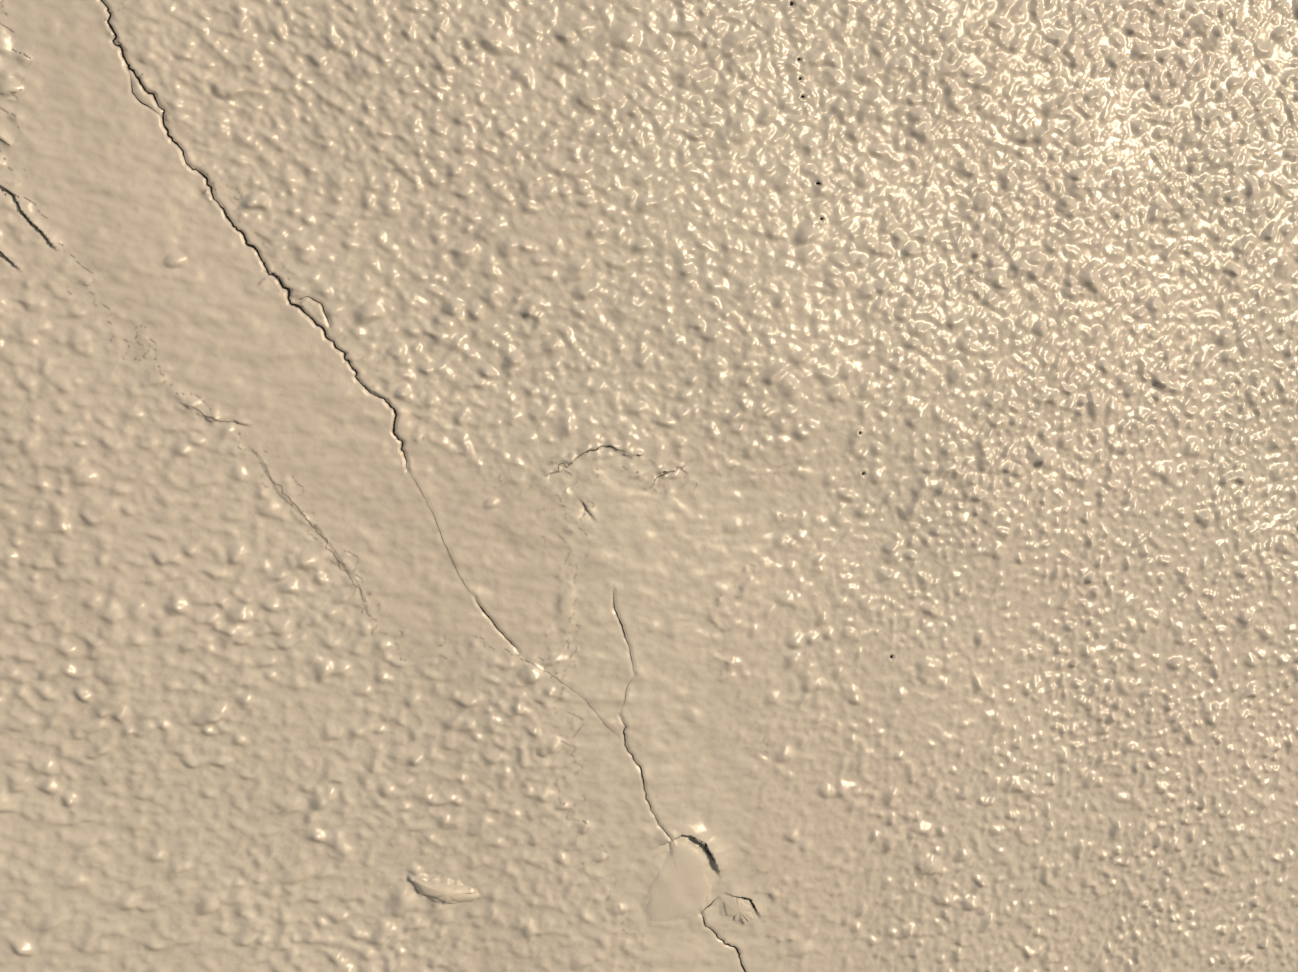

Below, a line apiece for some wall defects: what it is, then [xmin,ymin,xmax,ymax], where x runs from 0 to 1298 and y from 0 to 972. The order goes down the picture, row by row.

crack [101,0,672,840]
crack [699,897,746,972]
peeling [723,896,757,924]